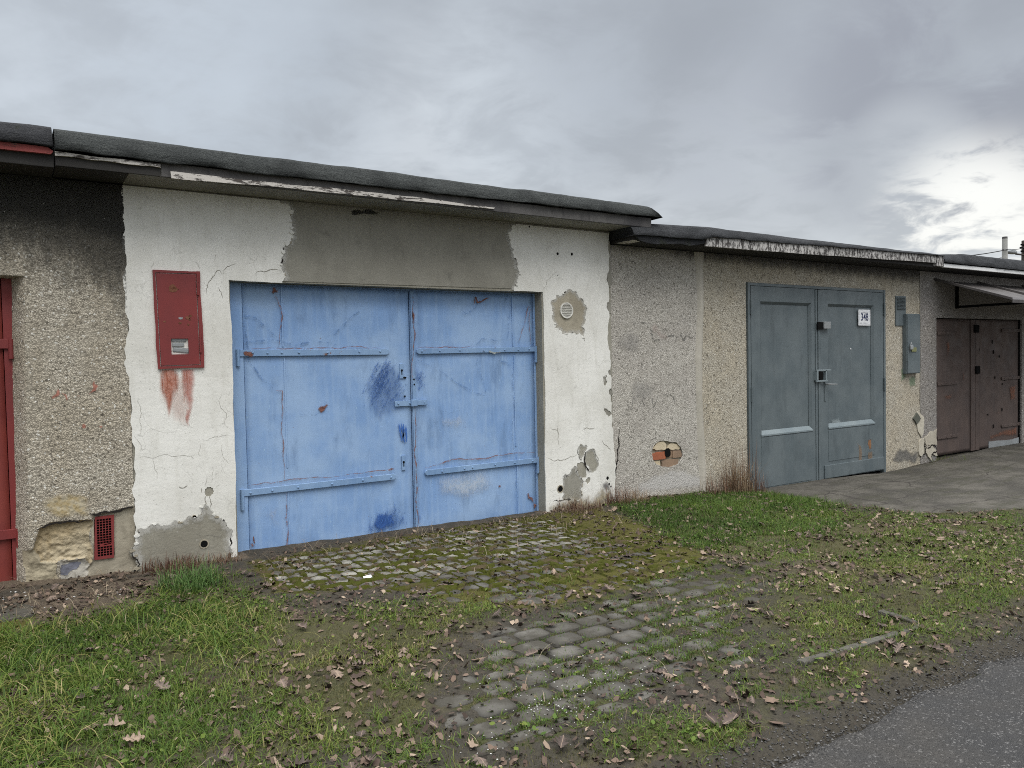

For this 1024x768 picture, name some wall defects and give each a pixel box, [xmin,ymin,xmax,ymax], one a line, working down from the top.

rust [163,369,193,420]
crack [138,394,227,507]
spalling [562,444,599,501]
spalling [652,441,682,467]
peeling [916,412,938,461]
spalling [22,507,133,582]